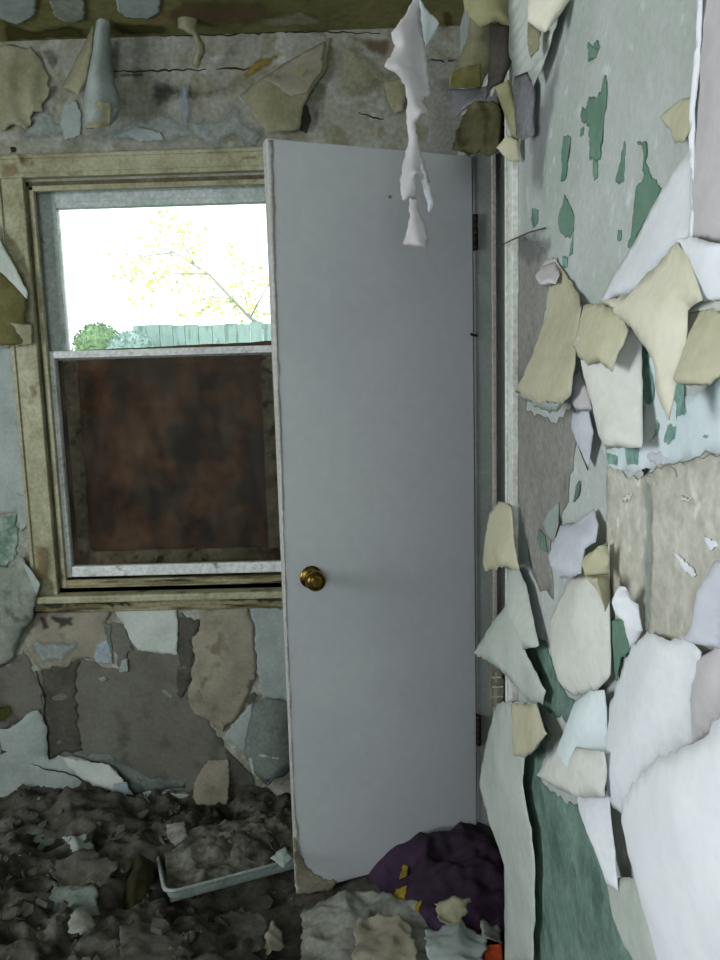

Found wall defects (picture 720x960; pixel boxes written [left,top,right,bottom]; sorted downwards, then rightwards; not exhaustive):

peeling [60,100,261,145]
crack [113,66,250,74]
crack [160,29,380,37]
peeling [560,75,607,182]
peeling [587,40,600,62]
peeling [615,141,661,248]
flaking render [518,195,580,600]
flaking render [605,344,720,681]
flaking render [0,346,287,801]
flaking render [489,664,505,707]
peeling [525,638,575,723]
peeling [523,725,633,960]